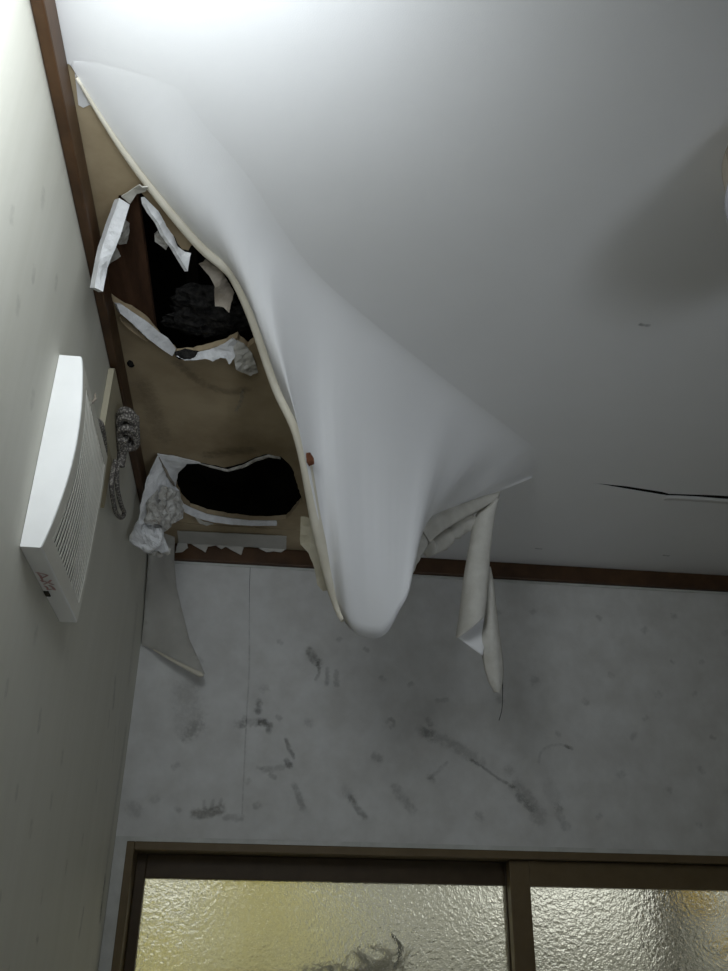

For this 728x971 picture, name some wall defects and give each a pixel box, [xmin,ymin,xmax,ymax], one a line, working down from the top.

peeling [67,64,192,271]
peeling [112,294,309,677]
crack [604,484,728,504]